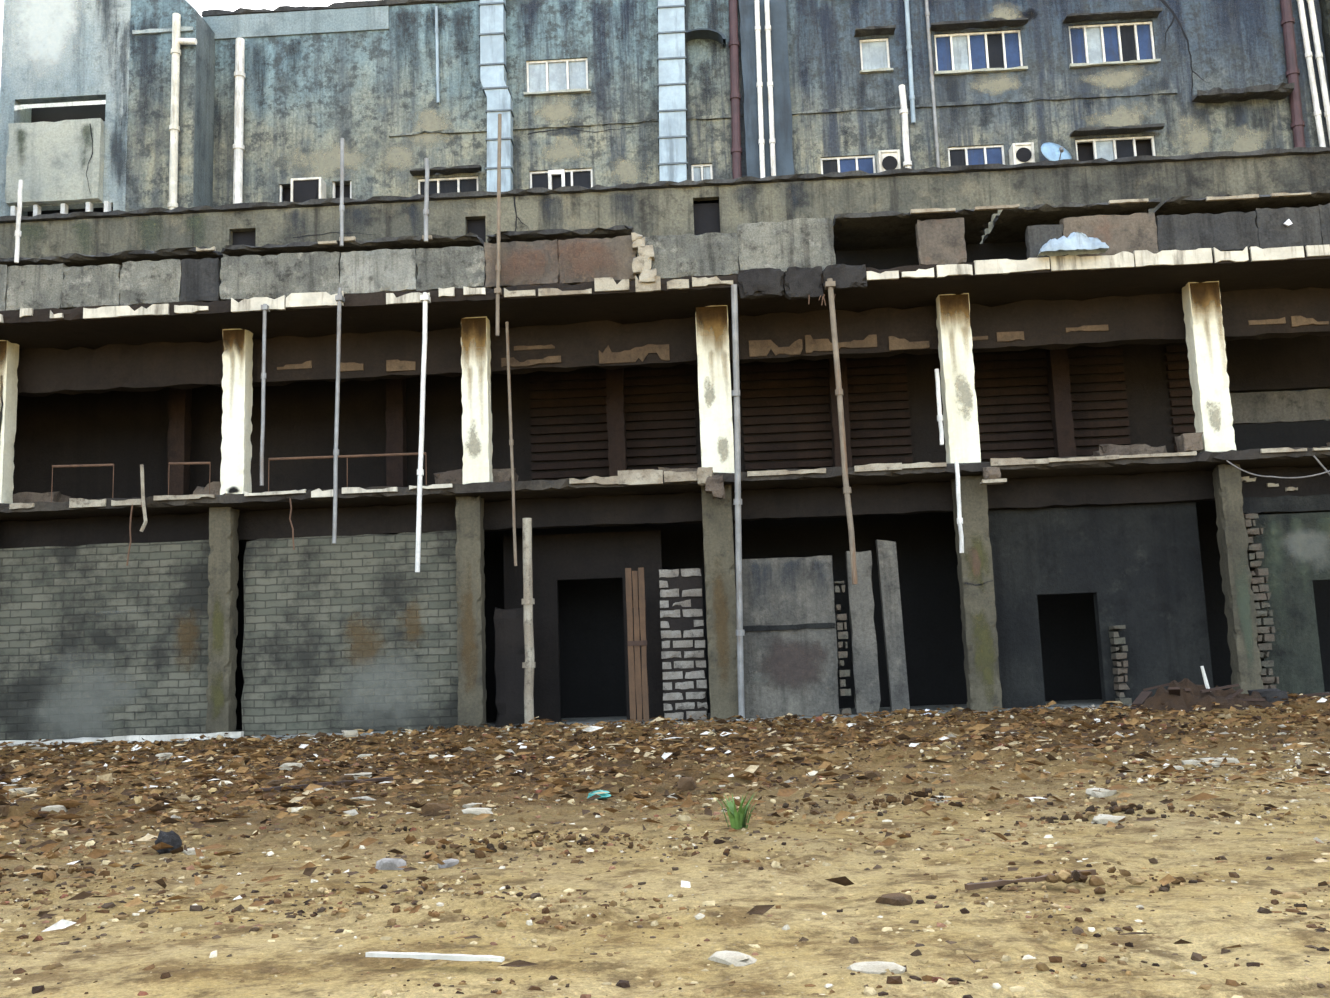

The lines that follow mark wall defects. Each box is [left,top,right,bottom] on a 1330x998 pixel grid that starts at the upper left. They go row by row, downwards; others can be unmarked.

damp [99,0,156,109]
damp [592,0,629,63]
crack [1160,0,1206,95]
damp [112,114,127,178]
damp [551,127,578,135]
spalling [318,236,356,245]
peeling [386,286,486,305]
spalling [504,232,1330,306]